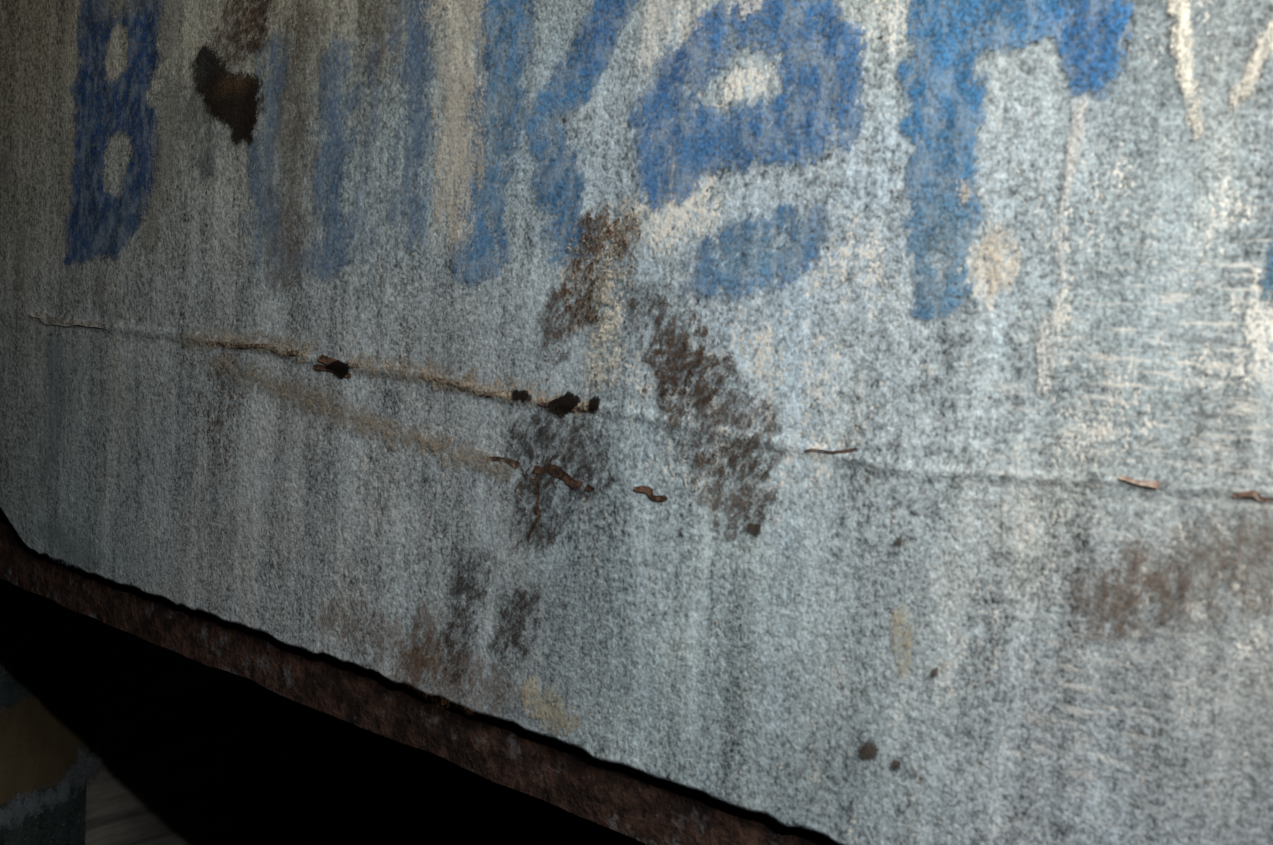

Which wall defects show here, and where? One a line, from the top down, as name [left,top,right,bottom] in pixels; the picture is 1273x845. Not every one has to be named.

hole [190,41,267,145]
efflorescence [1167,0,1206,139]
efflorescence [1230,21,1273,108]
water stain [1035,95,1088,394]
crack [206,341,361,378]
crack [421,374,594,412]
crack [803,446,859,454]
crack [487,456,595,540]
crack [634,486,668,501]